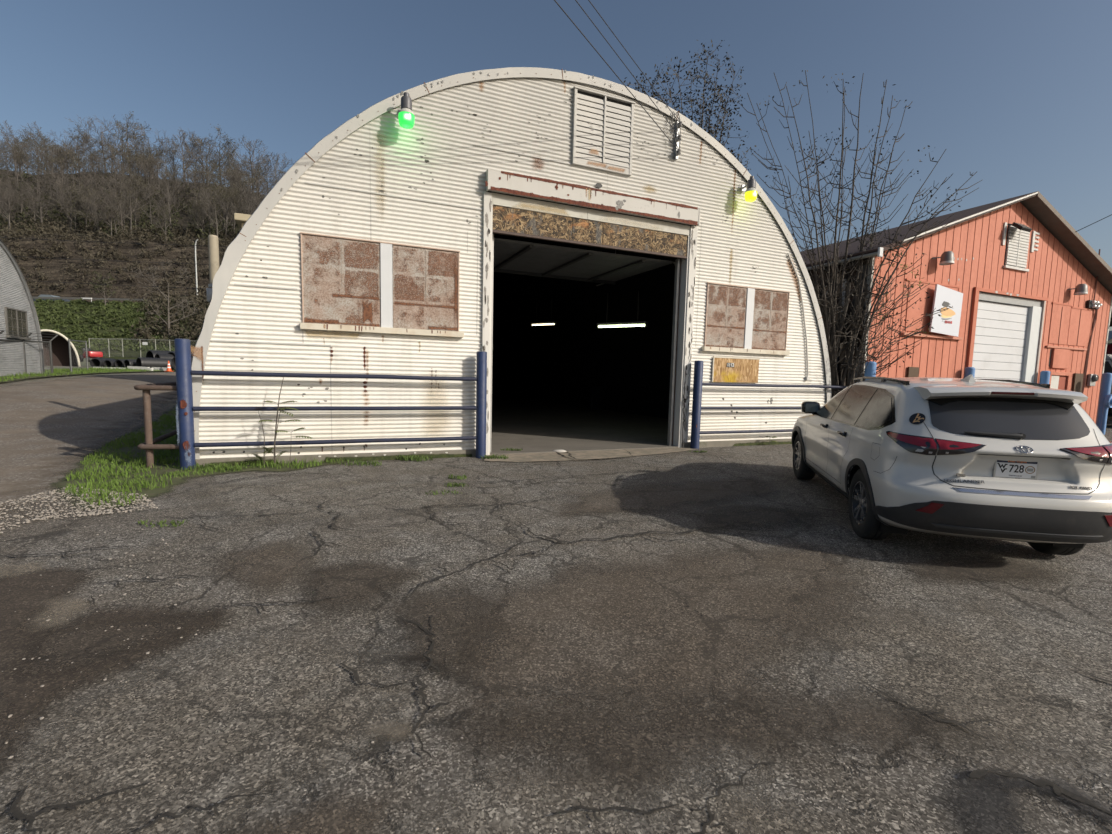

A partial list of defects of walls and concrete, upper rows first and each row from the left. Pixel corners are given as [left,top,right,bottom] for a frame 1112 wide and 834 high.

corrosion [305,242,384,421]
corrosion [394,249,458,333]
crack [1,327,780,758]
crack [547,762,780,834]